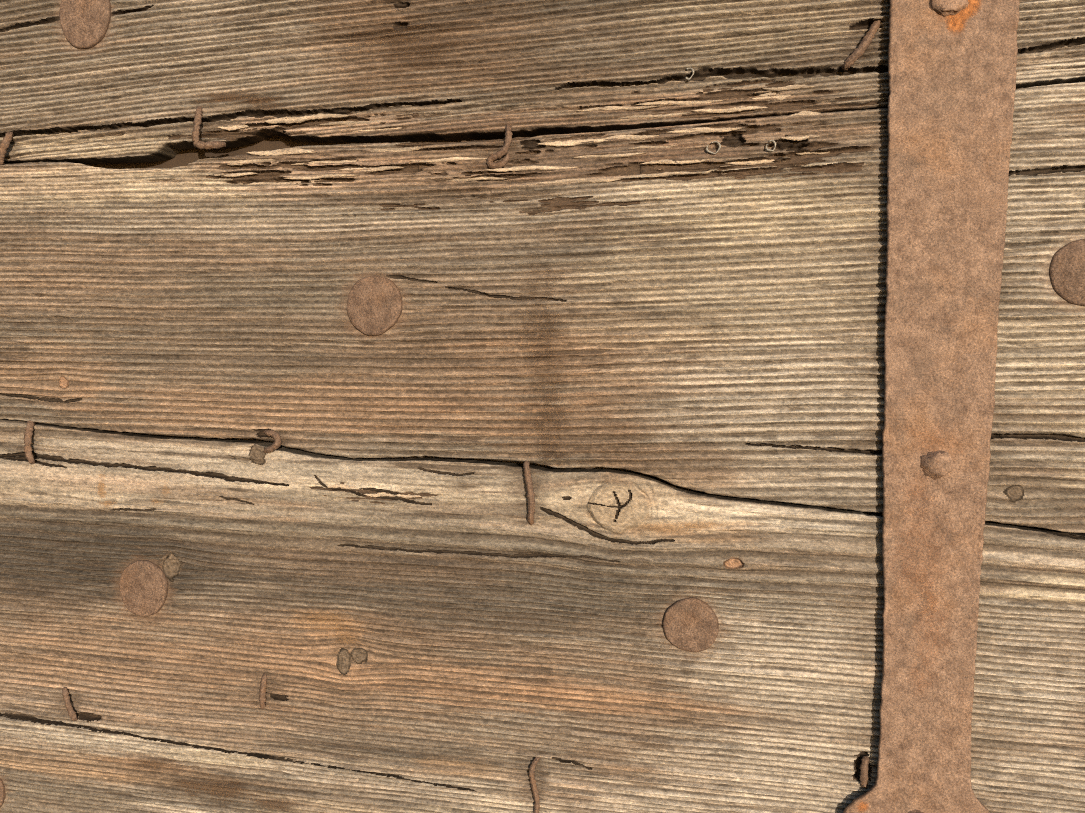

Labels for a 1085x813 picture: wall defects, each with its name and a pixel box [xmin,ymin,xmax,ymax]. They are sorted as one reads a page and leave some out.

rust [948,0,979,31]
crack [0,98,462,137]
crack [745,443,882,456]
crack [991,433,1085,442]
crack [0,452,289,505]
crack [314,475,432,506]
crack [418,467,475,476]
crack [1047,532,1085,540]